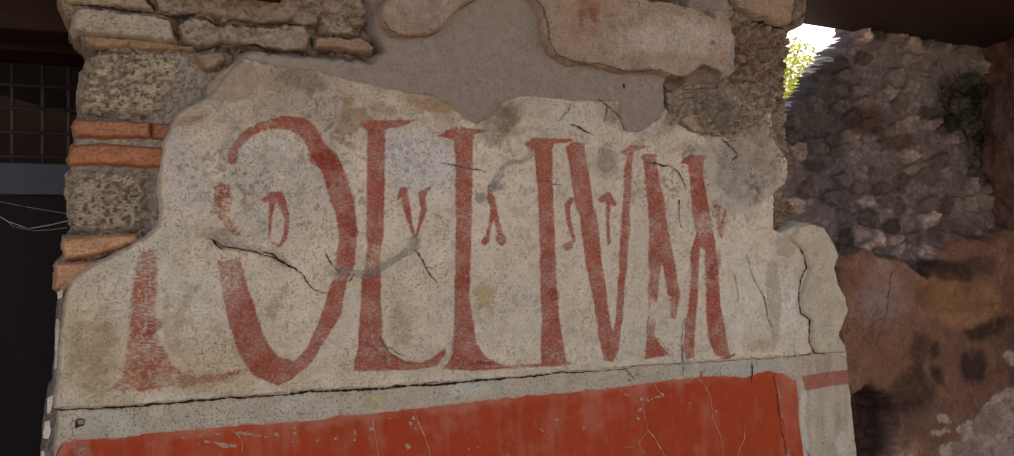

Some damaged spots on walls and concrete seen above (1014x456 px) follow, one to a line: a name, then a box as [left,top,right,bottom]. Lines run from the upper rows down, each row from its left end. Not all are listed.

spalling [664,65,723,91]
crack [210,238,354,293]
crack [55,249,825,456]